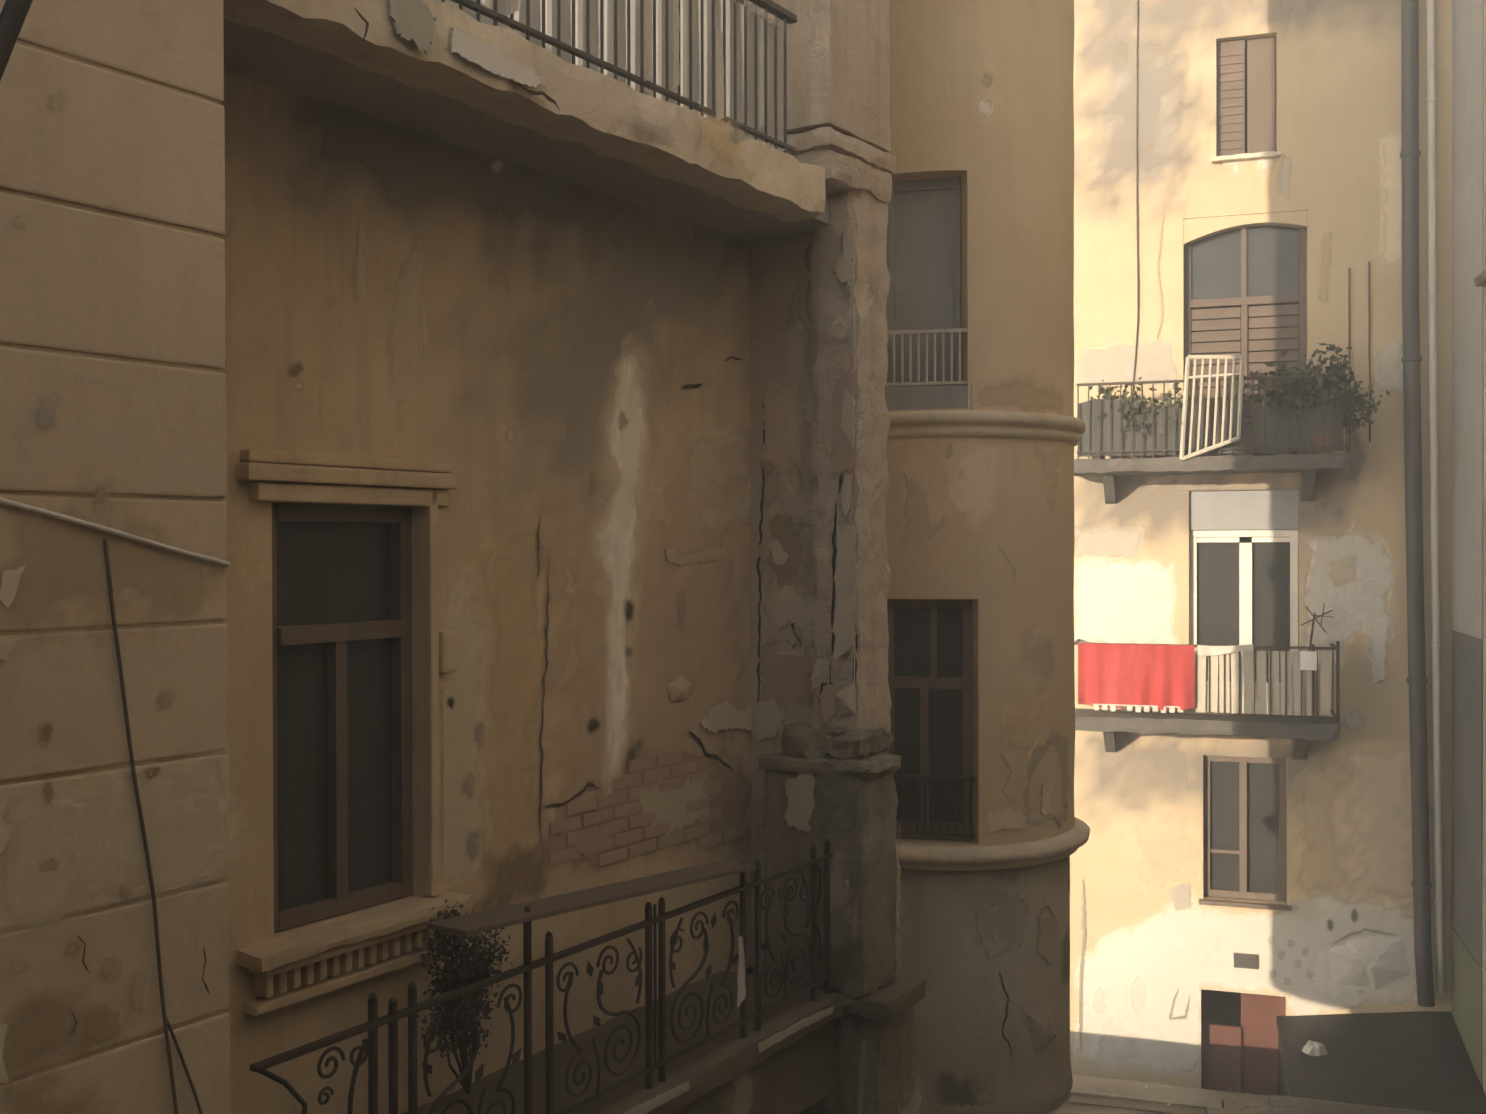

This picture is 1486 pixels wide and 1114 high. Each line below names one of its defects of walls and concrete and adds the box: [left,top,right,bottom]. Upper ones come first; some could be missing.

peeling [832,471,858,683]
peeling [1372,617,1389,683]
spalling [700,666,775,733]
crack [690,731,733,770]
peeling [639,778,709,835]
peeling [784,773,816,833]
peeling [1170,883,1191,911]
crack [999,973,1014,1059]